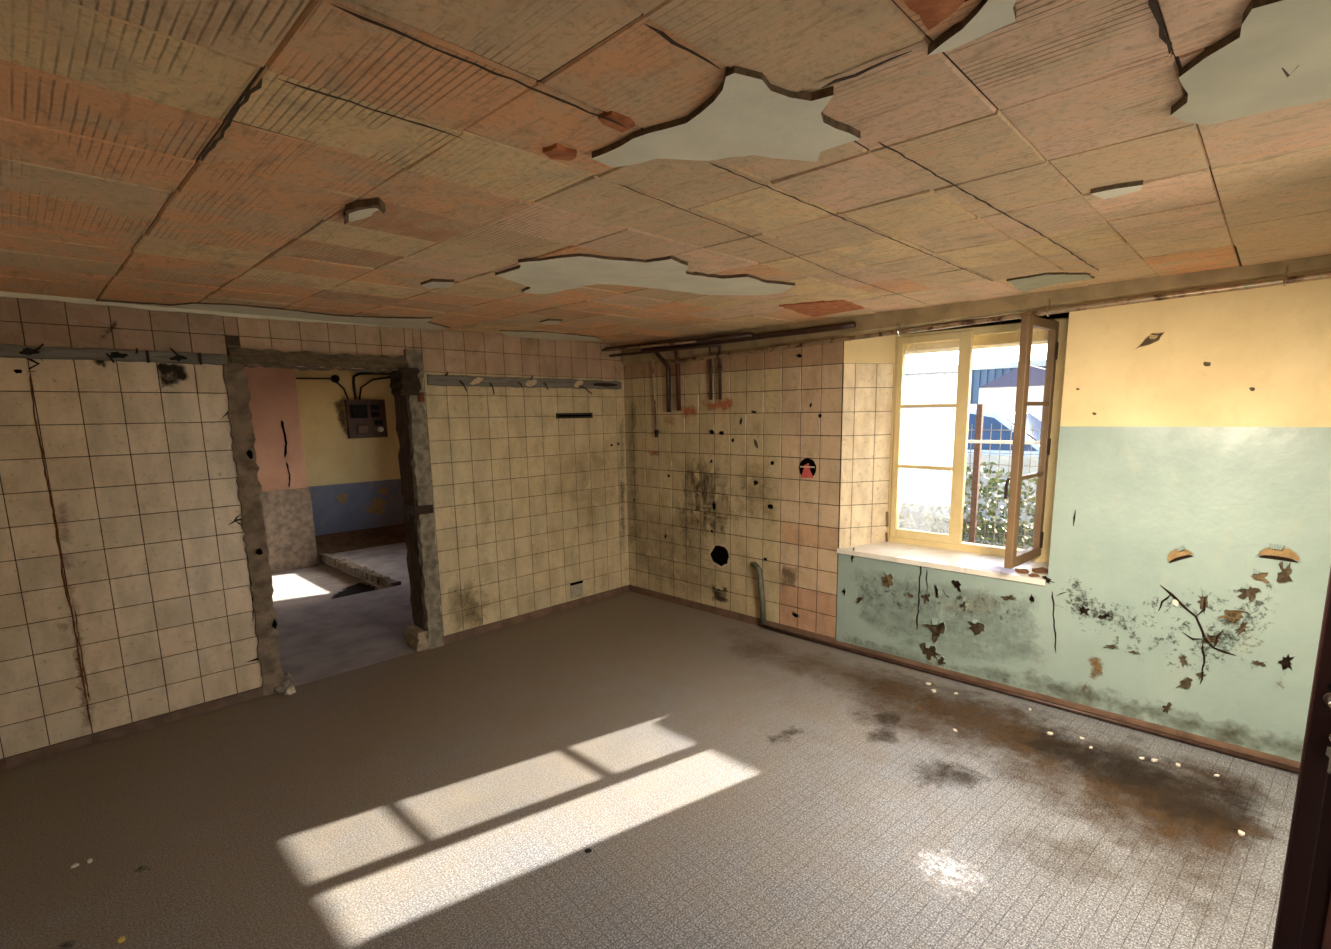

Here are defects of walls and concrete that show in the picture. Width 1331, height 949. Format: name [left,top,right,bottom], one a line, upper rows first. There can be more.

spalling [904,0,969,30]
spalling [598,111,635,133]
water stain [681,465,725,531]
crack [26,358,92,728]
peeling [1167,545,1195,563]
peeling [881,572,1035,666]
peeling [1077,605,1111,620]
peeling [1162,653,1207,713]
crack [1158,585,1236,684]
peeling [1197,543,1302,646]
peeling [1250,653,1295,670]